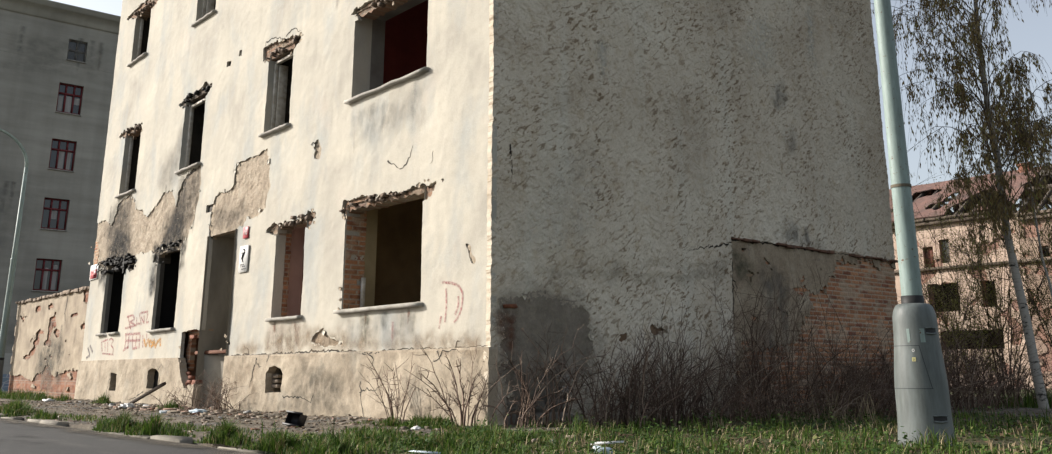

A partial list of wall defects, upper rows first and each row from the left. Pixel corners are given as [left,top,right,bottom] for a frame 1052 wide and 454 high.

flaking render [88,166,201,272]
flaking render [208,150,270,240]
flaking render [8,304,78,399]
flaking render [313,329,339,347]
flaking render [731,237,898,416]